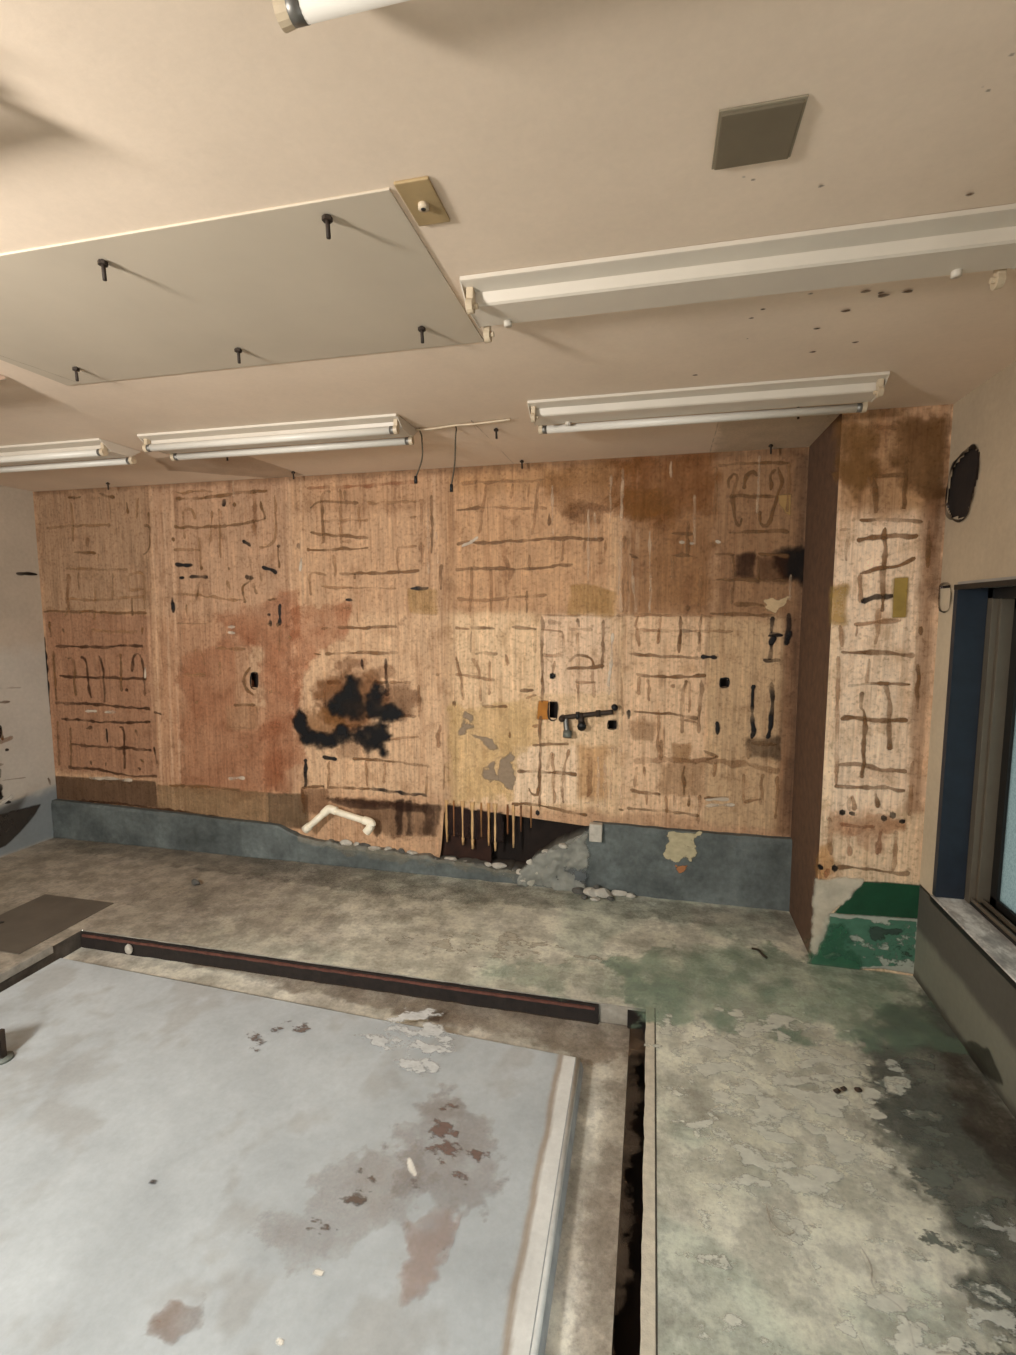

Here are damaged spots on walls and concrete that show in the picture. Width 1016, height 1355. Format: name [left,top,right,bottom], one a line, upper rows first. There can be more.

damp [171,490,280,613]
damp [635,602,792,663]
damp [43,571,249,816]
damp [747,685,779,759]
damp [0,775,40,848]
damp [257,716,577,851]
spalling [333,834,590,892]
peeling [663,831,702,873]
peeling [808,878,917,974]
peeling [968,1042,1002,1083]
peeling [974,1212,1016,1255]
peeling [854,1281,1016,1355]